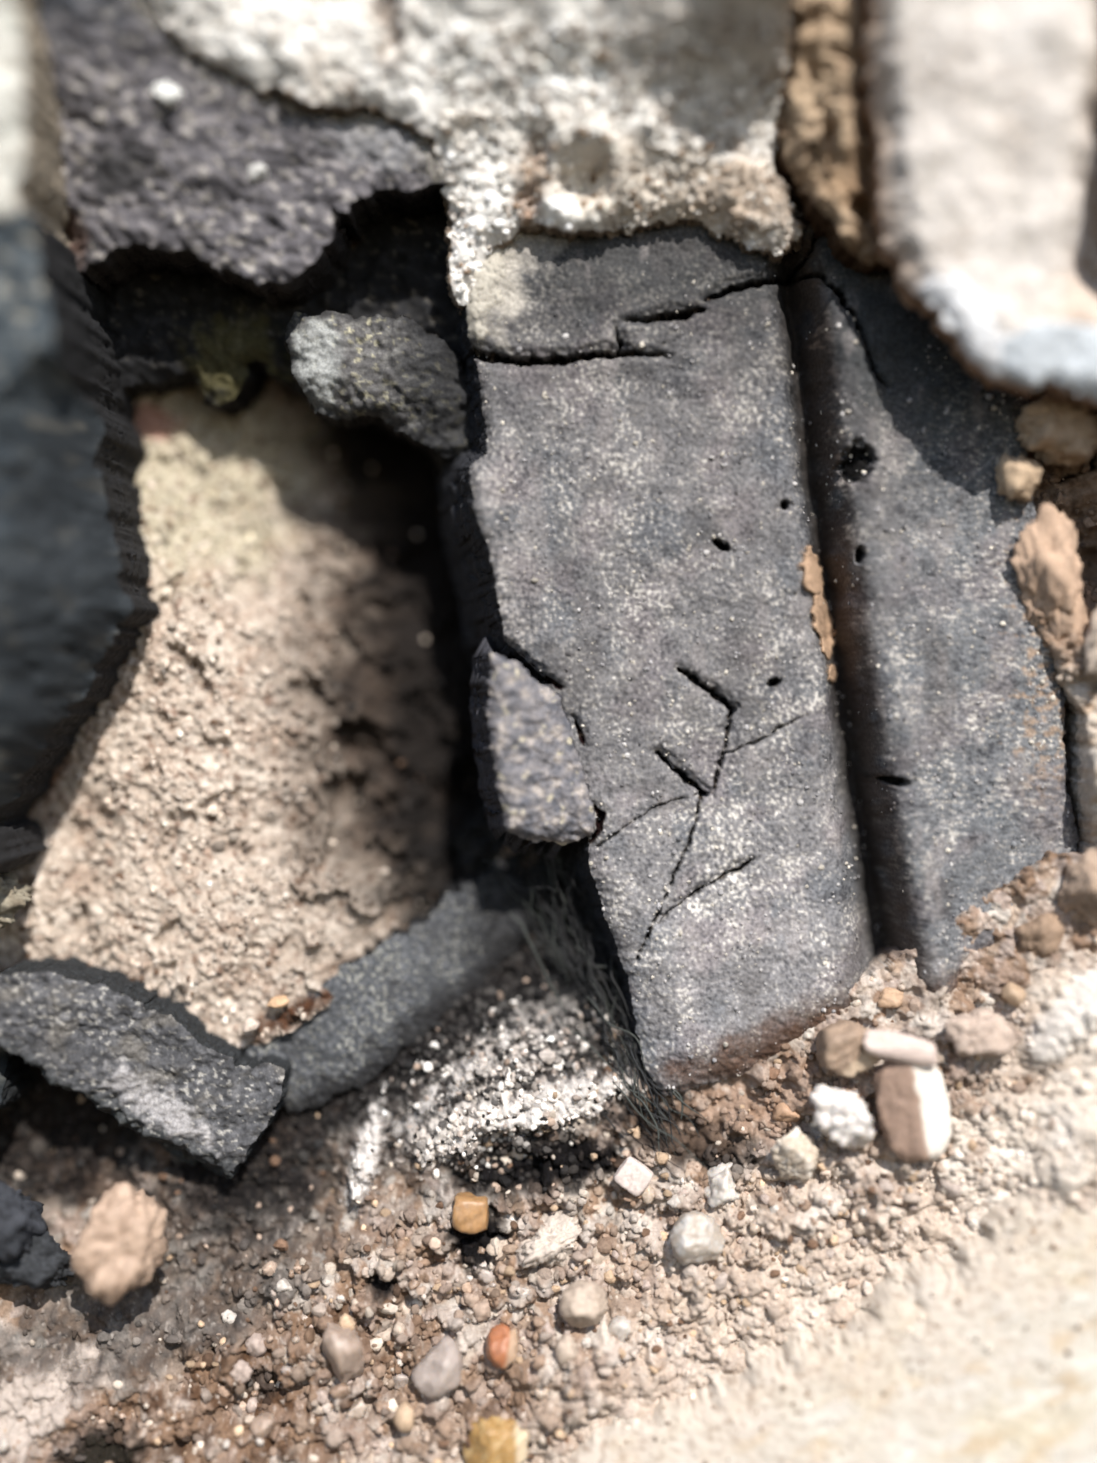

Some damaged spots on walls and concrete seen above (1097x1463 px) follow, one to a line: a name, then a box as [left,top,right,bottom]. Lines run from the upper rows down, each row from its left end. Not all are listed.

crack [474,237,883,384]
spalling [0,379,597,1048]
crack [503,640,586,745]
crack [589,805,607,843]
crack [637,667,751,957]